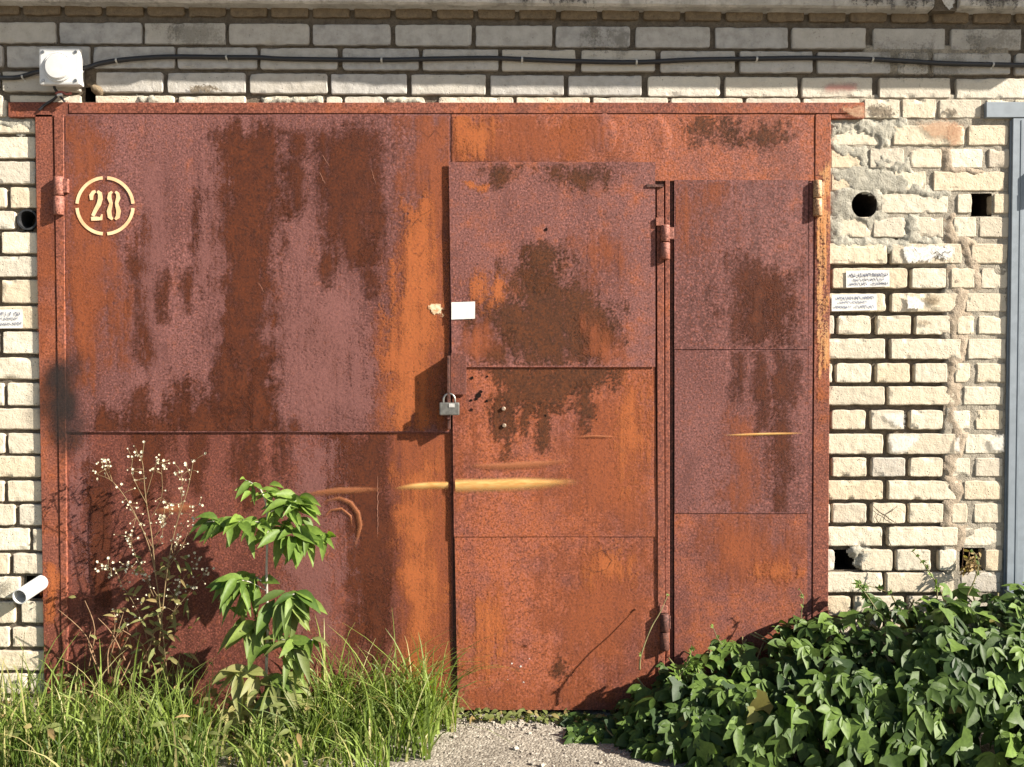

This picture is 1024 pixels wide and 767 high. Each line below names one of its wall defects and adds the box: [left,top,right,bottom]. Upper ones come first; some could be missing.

peeling [875,132,892,150]
spalling [852,193,879,217]
spalling [971,193,992,216]
rust [713,248,805,512]
rust [37,115,655,715]
spalling [833,545,873,570]